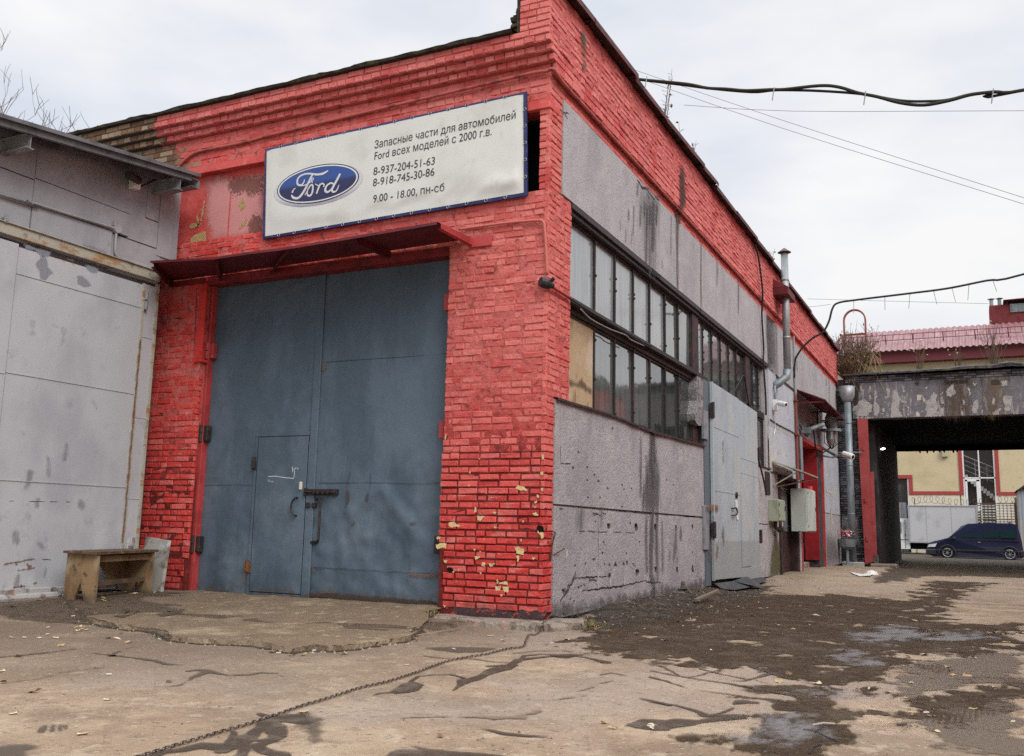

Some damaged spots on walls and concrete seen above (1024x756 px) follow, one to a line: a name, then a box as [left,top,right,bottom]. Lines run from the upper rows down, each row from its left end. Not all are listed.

peeling [189,201,206,243]
leakage [633,190,658,262]
peeling [852,380,1013,419]
rust [122,341,141,543]
peeling [436,536,459,573]
spalling [516,485,544,539]
crack [560,531,661,602]
leakage [554,426,705,618]